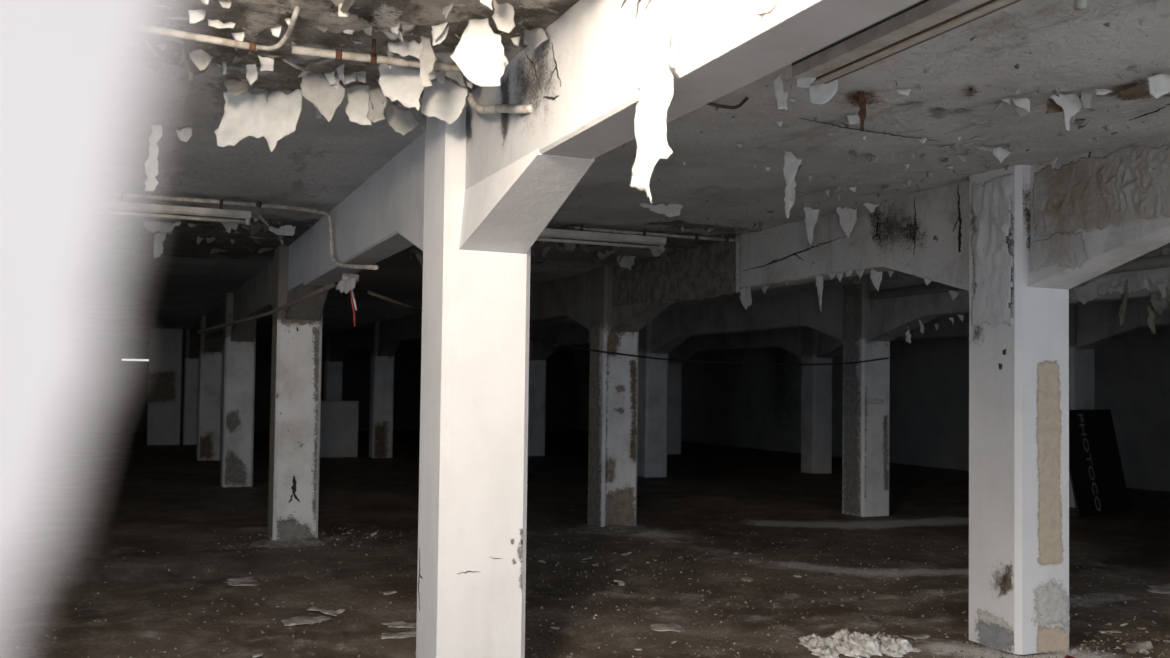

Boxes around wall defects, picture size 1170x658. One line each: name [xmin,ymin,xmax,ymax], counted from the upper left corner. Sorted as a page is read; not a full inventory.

crack [621,0,651,20]
crack [751,1,787,23]
peeling [162,0,559,153]
damp [500,42,554,139]
rust [847,91,879,130]
peeling [623,49,1170,245]
peeling [531,237,636,279]
peeling [740,279,791,310]
spalling [588,318,637,526]
spalling [1036,360,1063,565]
peeling [975,608,1014,655]
spalling [1032,579,1070,654]